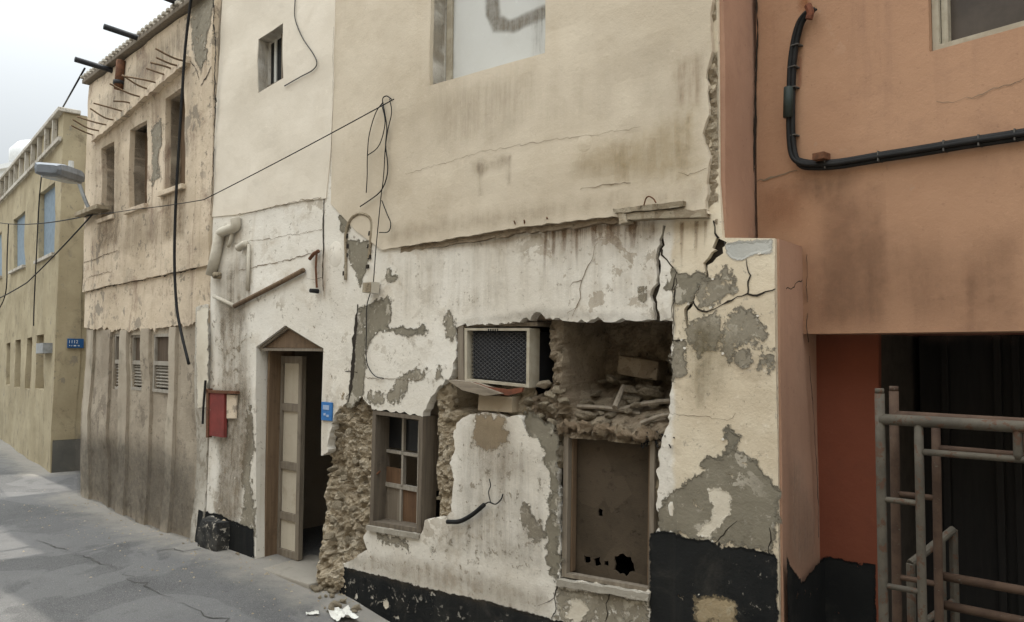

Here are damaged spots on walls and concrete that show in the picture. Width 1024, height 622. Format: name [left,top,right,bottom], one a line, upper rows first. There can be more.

peeling [190,0,214,70]
peeling [338,212,372,287]
crack [569,227,597,316]
peeling [346,268,443,408]
crack [652,220,819,538]
spalling [427,239,782,622]
peeling [348,579,468,620]